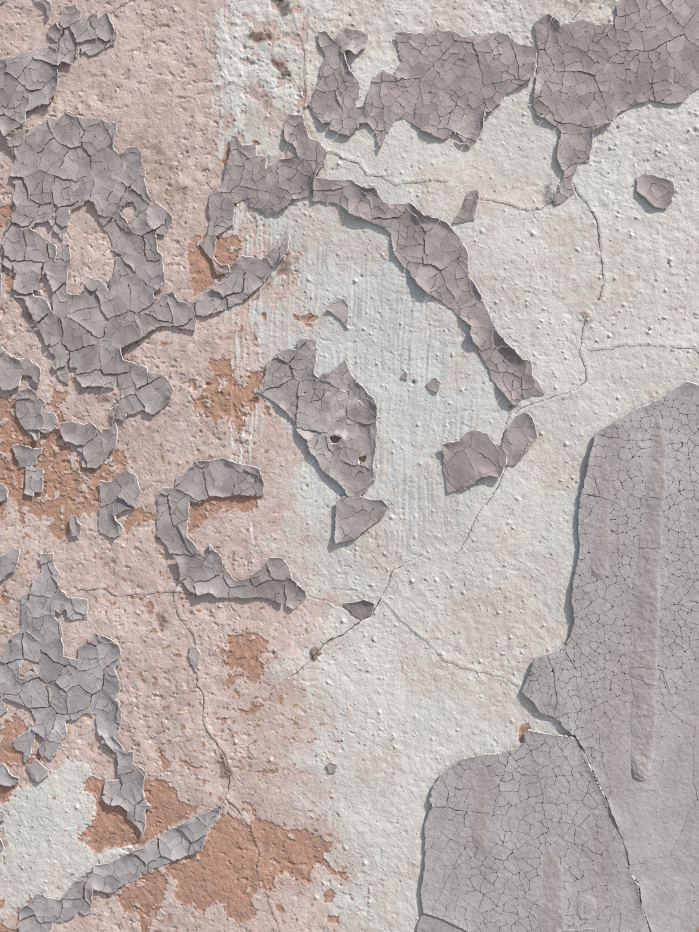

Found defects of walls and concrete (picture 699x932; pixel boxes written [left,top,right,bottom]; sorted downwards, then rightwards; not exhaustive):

peeling [0,0,699,609]
crack [501,186,699,443]
peeling [0,548,348,932]
crack [74,589,278,927]
crack [287,554,519,688]
crack [455,468,506,557]
peeling [417,381,699,932]
crack [548,644,576,711]